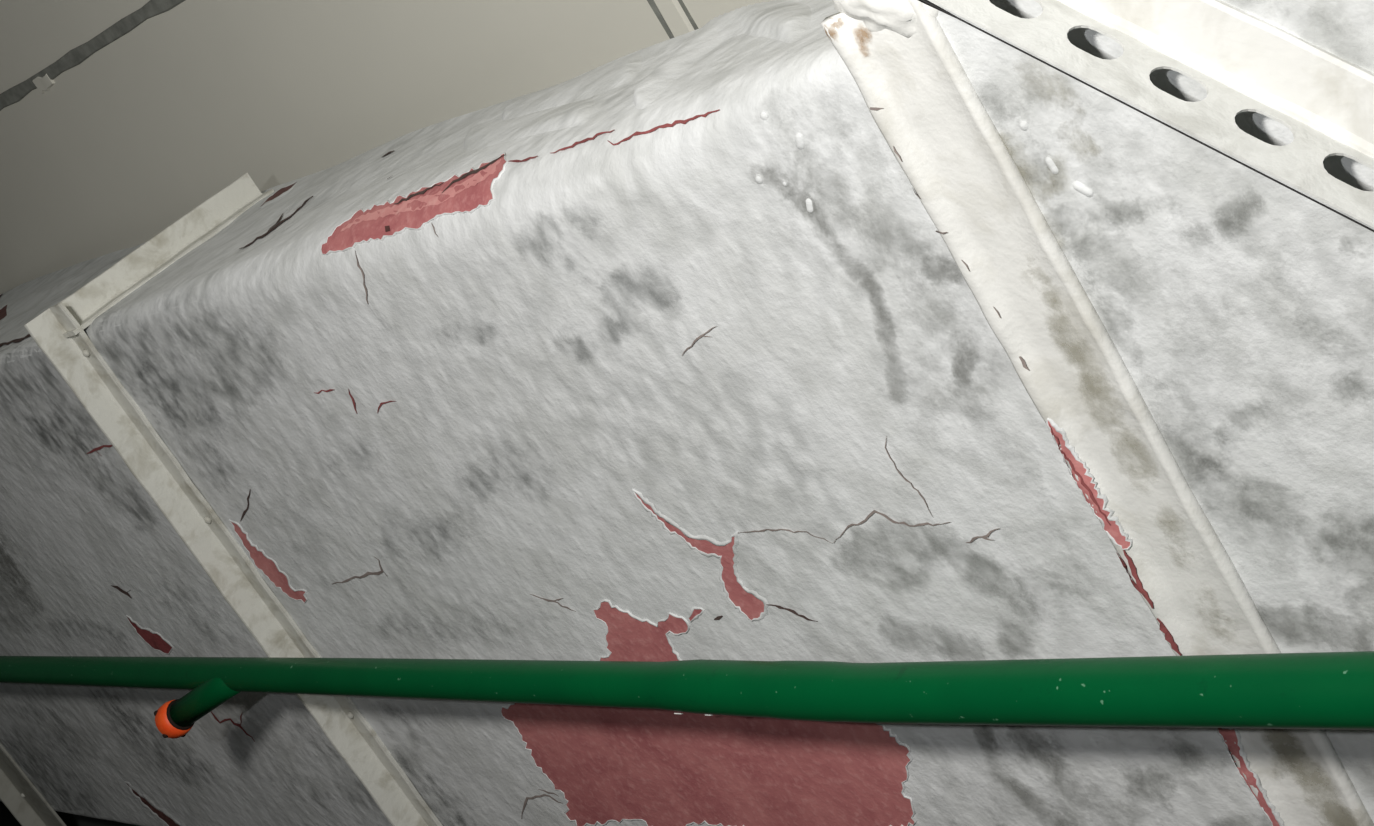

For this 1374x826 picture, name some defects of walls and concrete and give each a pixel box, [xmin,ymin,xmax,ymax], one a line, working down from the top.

crack [510,110,718,162]
peeling [321,153,508,255]
peeling [0,294,9,323]
peeling [229,491,307,603]
peeling [593,489,817,662]
crack [739,442,1000,543]
peeling [1046,418,1181,656]
peeling [126,615,174,655]
peeling [501,703,917,826]
peeling [1216,728,1284,826]